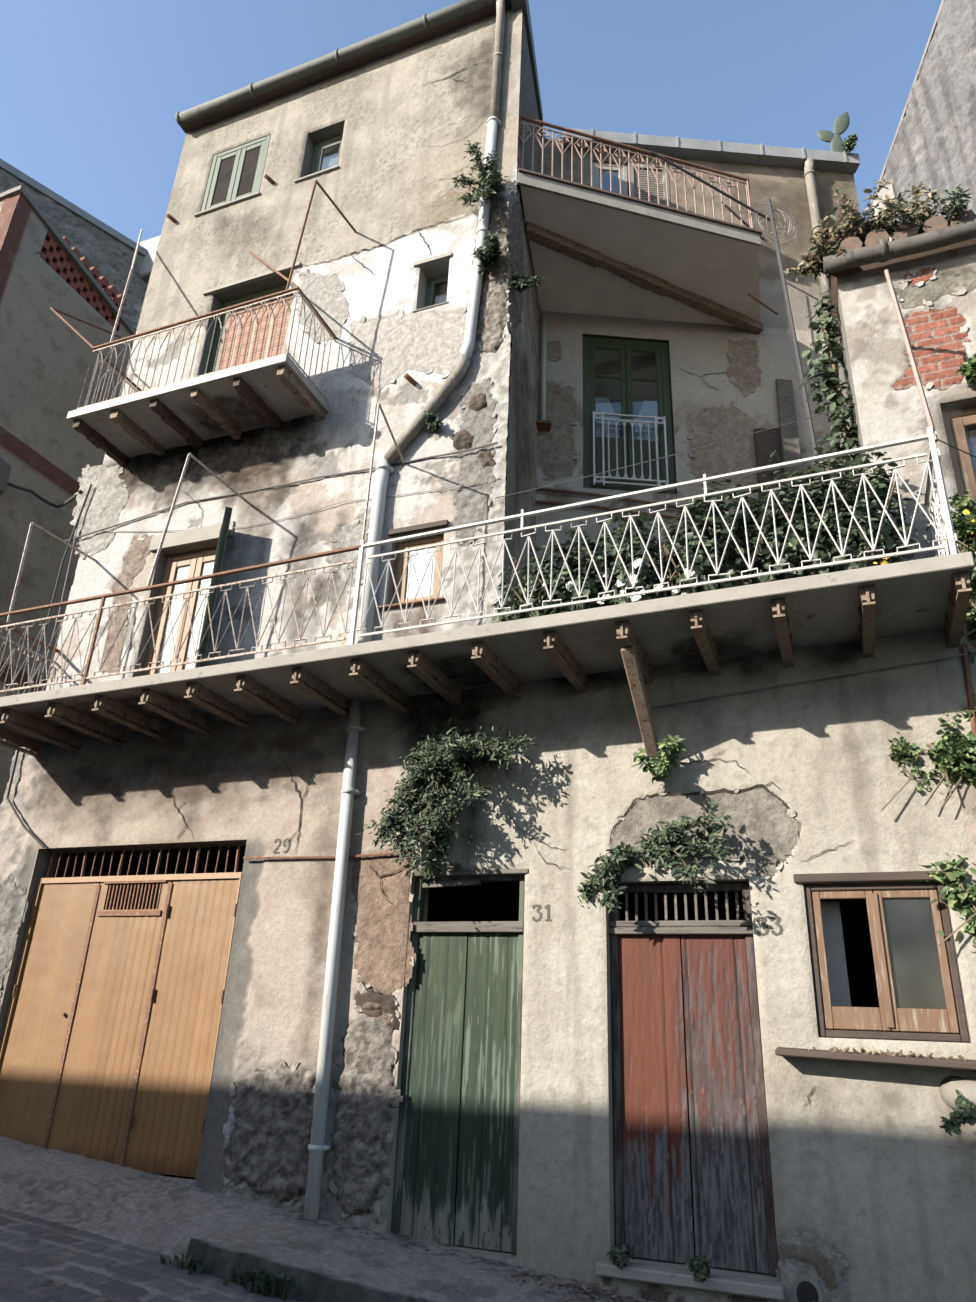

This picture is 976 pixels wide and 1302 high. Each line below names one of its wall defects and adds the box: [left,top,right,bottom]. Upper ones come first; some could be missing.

peeling [295,188,525,392]
flaking render [892,267,976,390]
crack [282,756,310,851]
spalling [610,787,798,876]
spalling [0,873,28,1008]
spalling [329,848,416,1218]
spalling [223,1059,317,1204]